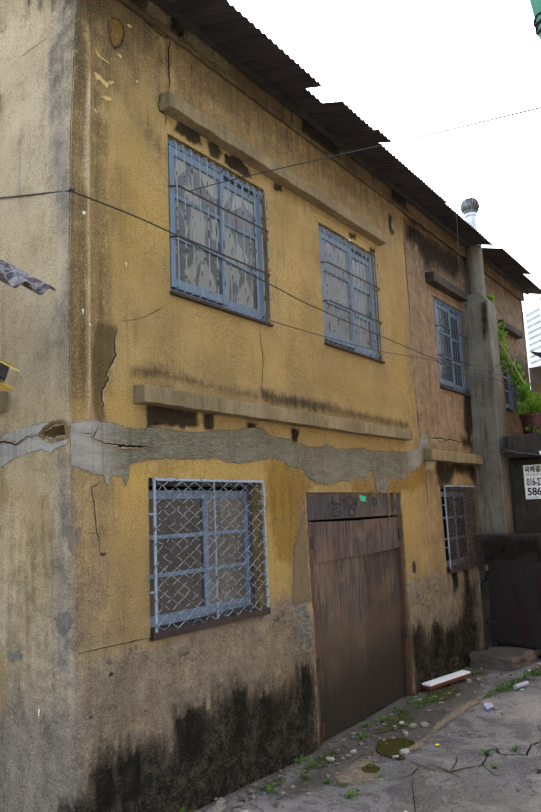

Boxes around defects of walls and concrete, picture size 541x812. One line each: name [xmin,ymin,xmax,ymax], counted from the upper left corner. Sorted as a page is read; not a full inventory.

peeling [94,72,115,101]
crack [0,434,39,445]
spalling [38,420,69,443]
crack [79,305,166,449]
peeling [273,512,313,654]
leakage [410,569,479,694]
leakage [58,665,319,812]